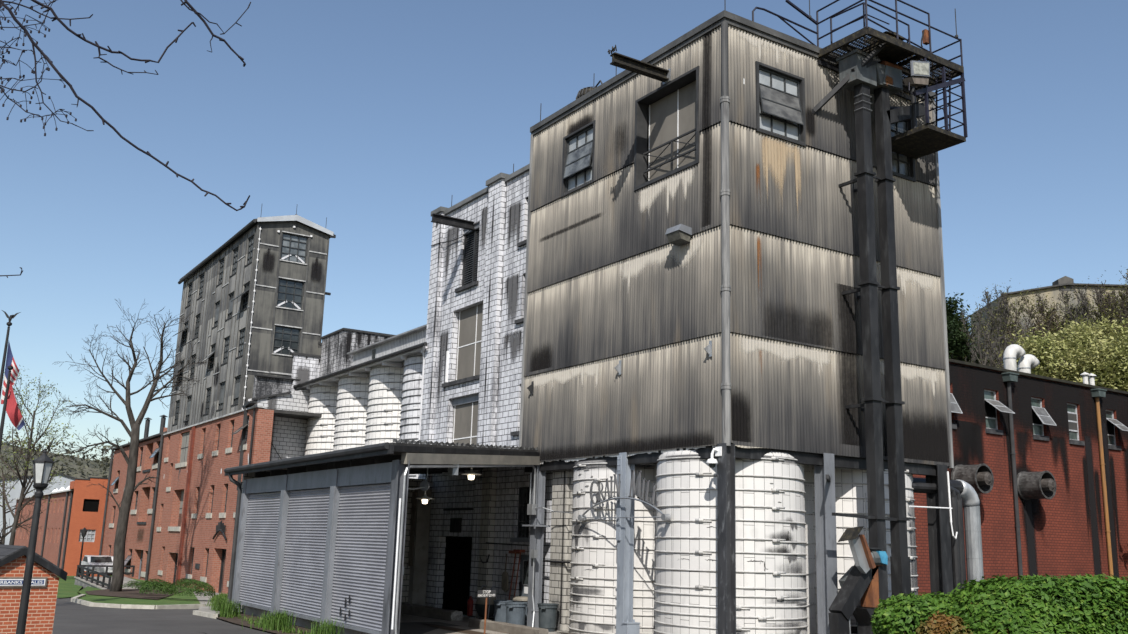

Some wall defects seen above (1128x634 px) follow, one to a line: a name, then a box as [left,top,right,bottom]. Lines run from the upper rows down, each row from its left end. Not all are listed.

leakage [482,193,521,247]
leakage [620,32,711,287]
leakage [731,395,751,442]
leakage [742,284,860,446]
leakage [900,363,1128,578]